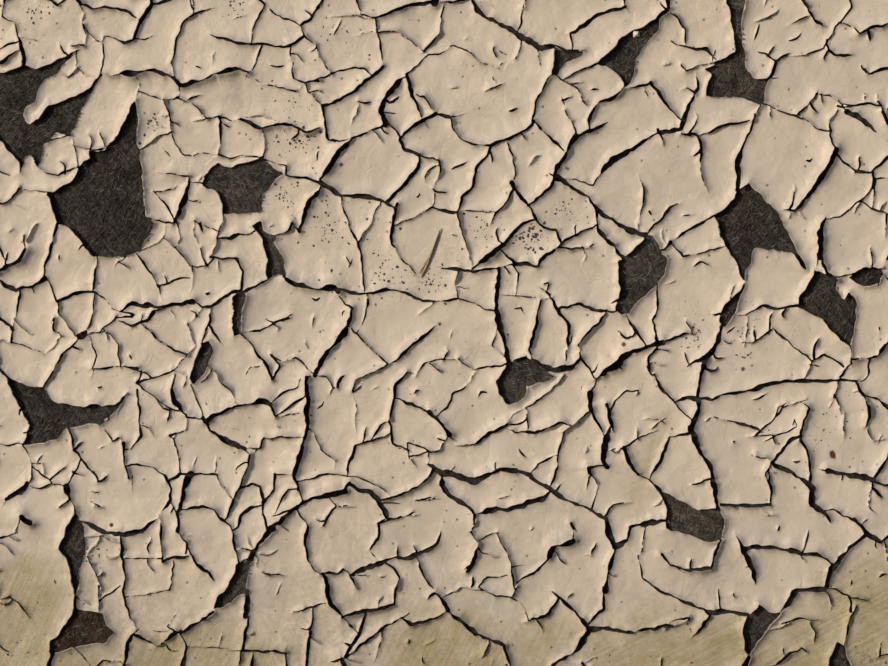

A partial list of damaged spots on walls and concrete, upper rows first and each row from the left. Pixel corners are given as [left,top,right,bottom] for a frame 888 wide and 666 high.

crack [0,242,106,329]
peeling [0,40,166,268]
peeling [181,147,298,395]
crack [352,0,439,61]
peeling [541,5,671,99]
peeling [704,173,888,358]
crack [786,123,888,285]
crack [835,93,888,133]
crack [5,426,108,515]
peeling [0,332,138,455]
crack [528,282,888,620]
peeling [40,502,125,663]